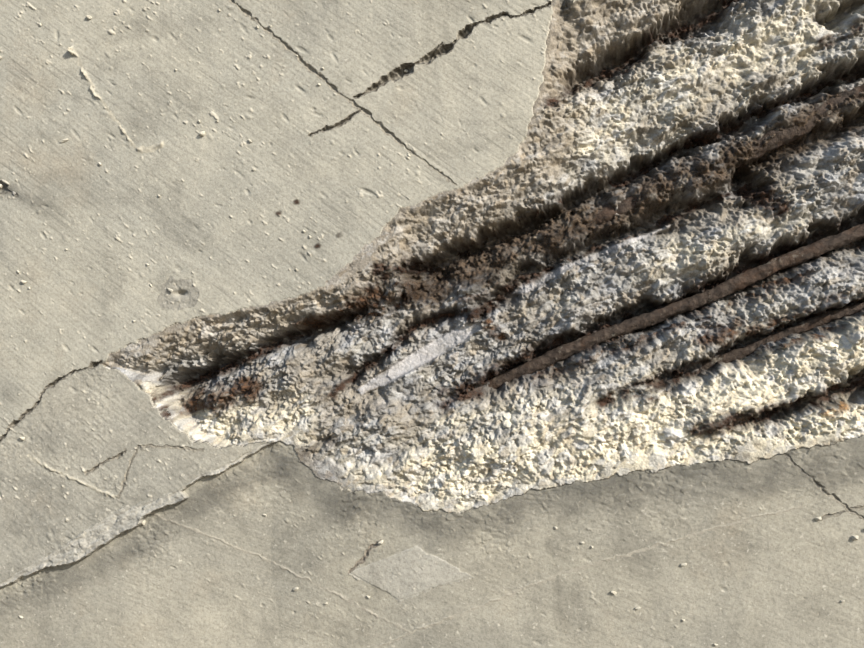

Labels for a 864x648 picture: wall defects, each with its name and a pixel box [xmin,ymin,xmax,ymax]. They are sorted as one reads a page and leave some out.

crack [307,1,552,137]
spalling [102,0,864,514]
corrosion [152,63,864,418]
crack [0,360,104,443]
crack [84,447,127,476]
peeling [0,364,276,588]
crack [784,453,864,521]